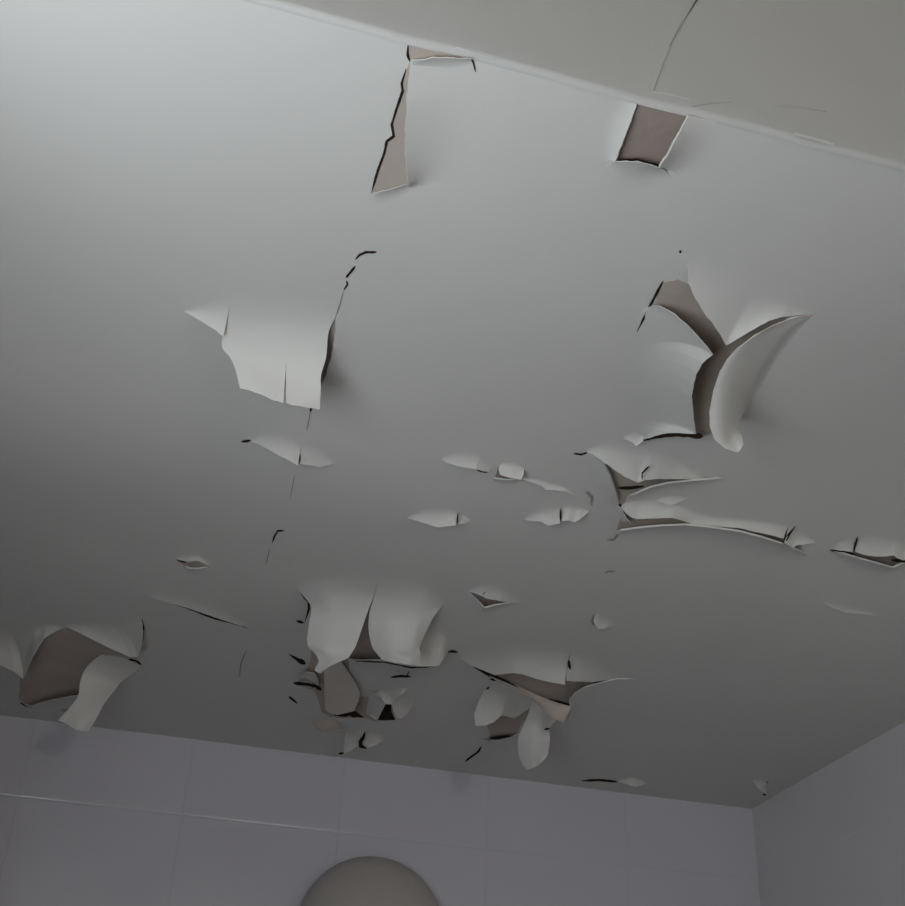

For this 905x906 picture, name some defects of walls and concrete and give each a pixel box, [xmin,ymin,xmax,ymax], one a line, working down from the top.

peeling [369,45,498,206]
peeling [600,101,731,189]
crack [337,251,377,314]
peeling [184,291,365,429]
peeling [241,432,336,467]
peeling [442,250,817,563]
peeling [408,507,473,527]
peeling [829,534,905,584]
peeling [0,615,145,731]
peeling [289,576,640,770]